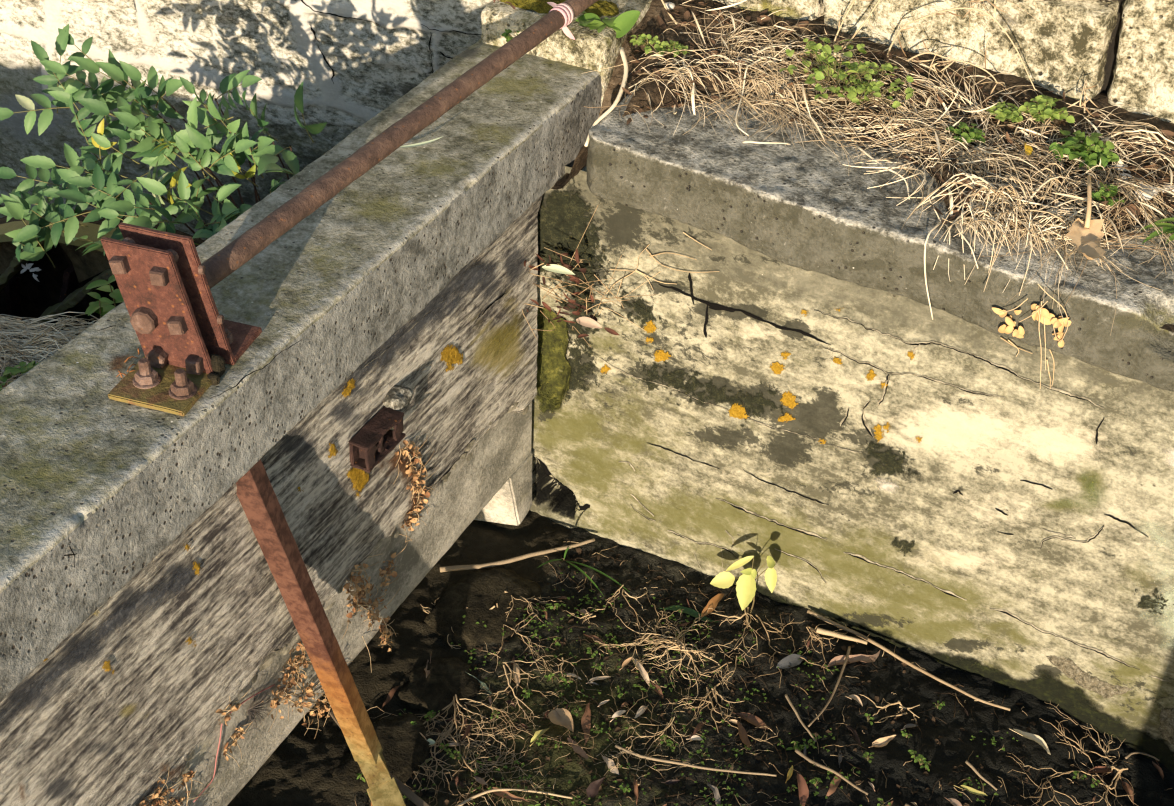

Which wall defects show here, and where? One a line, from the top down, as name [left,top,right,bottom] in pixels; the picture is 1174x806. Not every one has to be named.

crack [294,0,379,84]
corrosion [110,348,140,378]
water stain [632,353,784,427]
crack [601,273,1104,453]